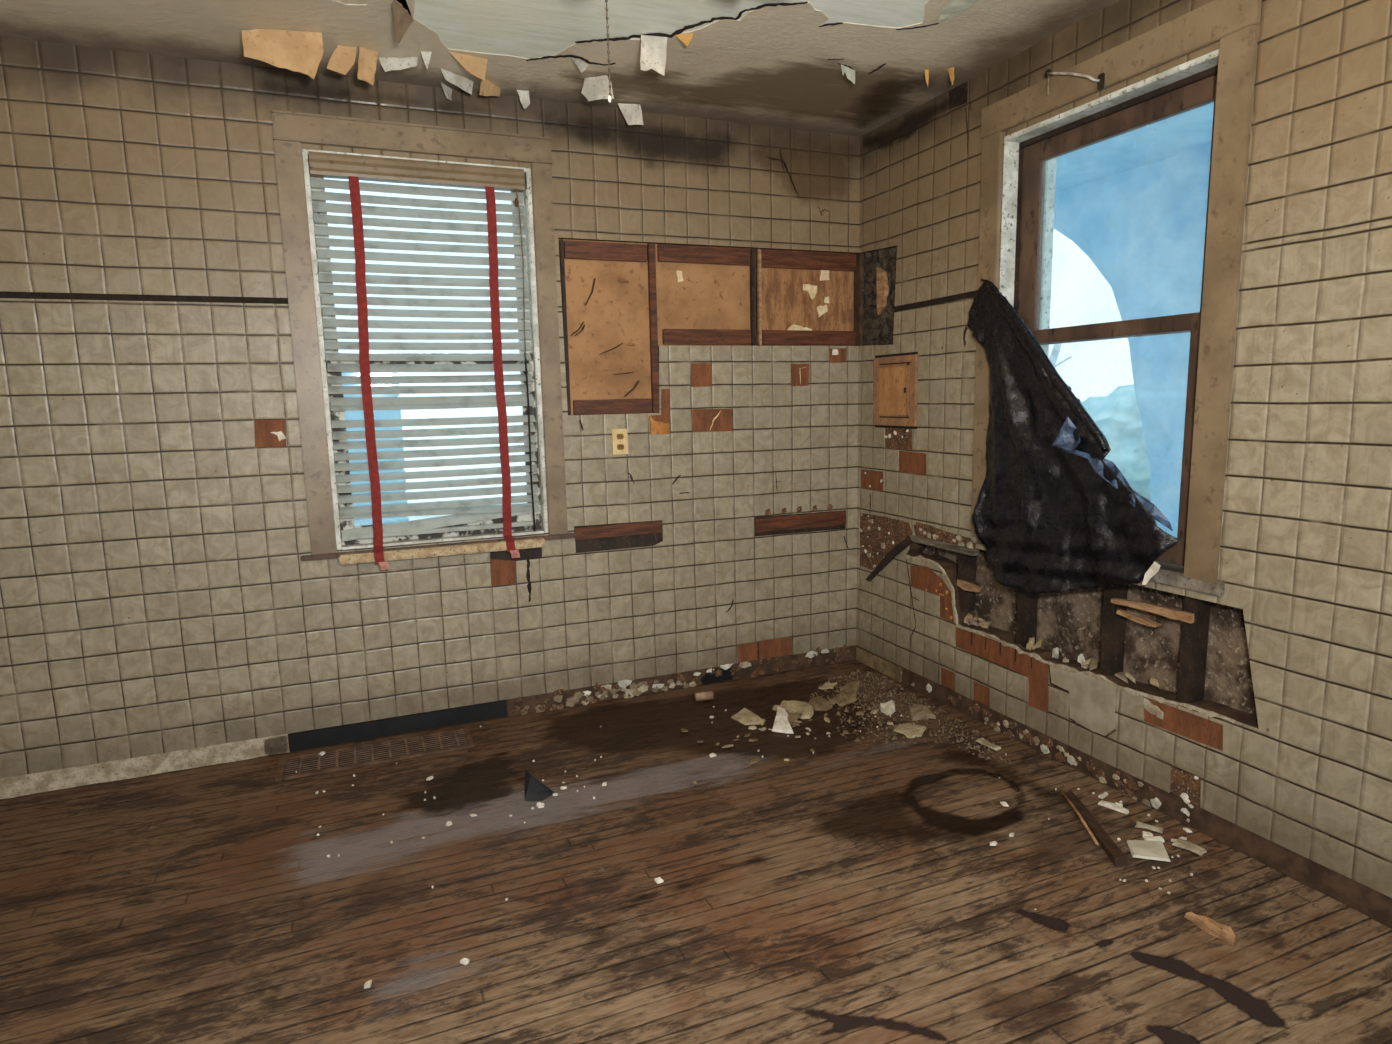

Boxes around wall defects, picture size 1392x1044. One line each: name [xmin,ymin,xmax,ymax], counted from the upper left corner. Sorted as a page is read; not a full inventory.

crack [526,2,886,74]
crack [896,22,939,30]
flaking render [242,0,979,125]
peeling [691,363,712,387]
peeling [791,364,809,386]
peeling [254,419,286,447]
peeling [692,409,732,432]
peeling [861,428,927,492]
peeling [574,520,663,553]
peeling [490,547,542,586]
peeling [754,504,1236,751]
spalling [506,636,1392,929]